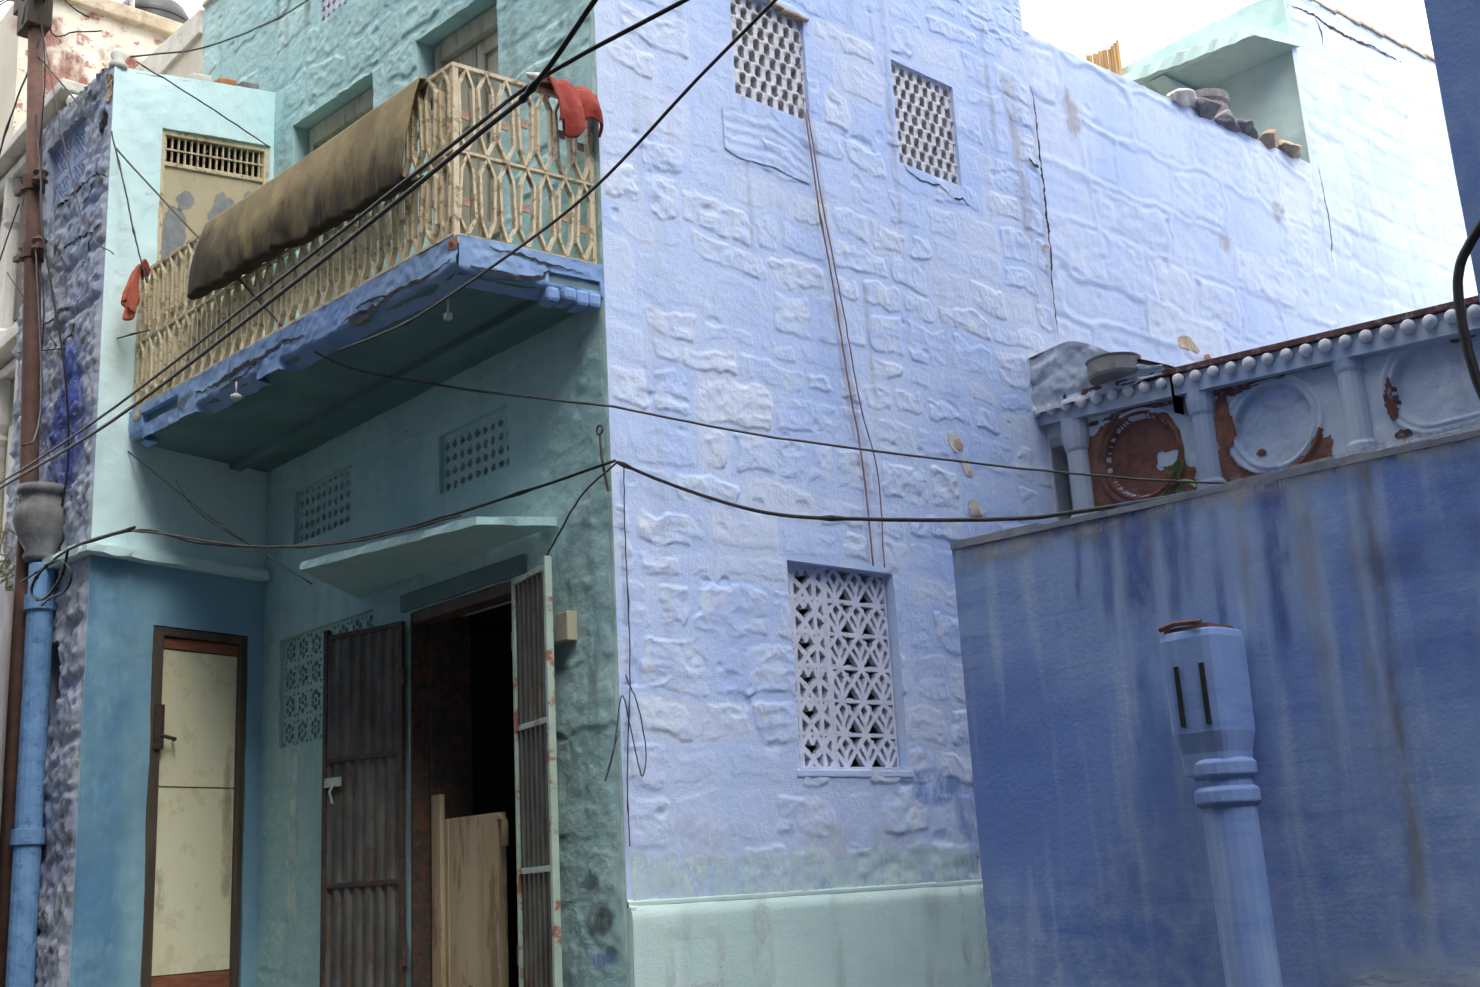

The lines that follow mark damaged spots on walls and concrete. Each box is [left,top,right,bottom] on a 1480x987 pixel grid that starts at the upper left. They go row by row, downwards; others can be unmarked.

peeling [1088,400,1197,512]
peeling [1213,365,1334,482]